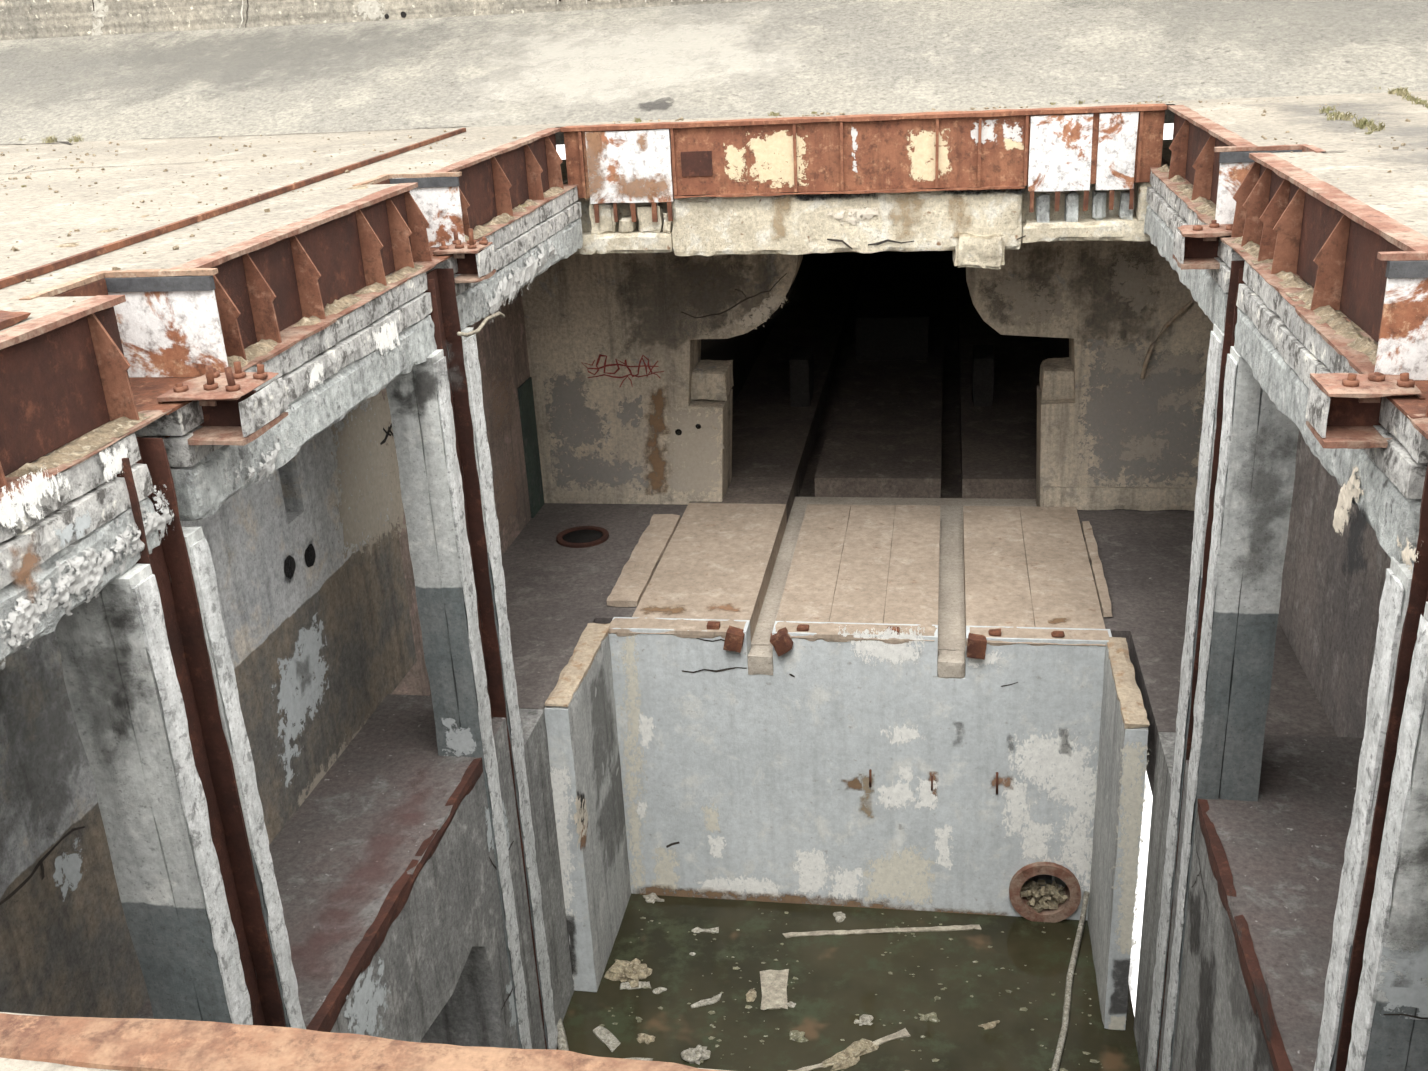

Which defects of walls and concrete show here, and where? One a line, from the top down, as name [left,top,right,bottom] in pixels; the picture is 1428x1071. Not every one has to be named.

spalling [560,159,568,185]
rust [584,132,668,200]
peeling [724,130,809,188]
peeling [906,129,952,182]
spalling [1161,139,1173,167]
spalling [796,191,878,201]
spalling [826,207,881,225]
rust [843,769,874,818]
rust [991,772,1012,794]
spalling [1345,601,1428,1071]
spalling [1024,874,1067,896]
crack [1384,1012,1428,1020]